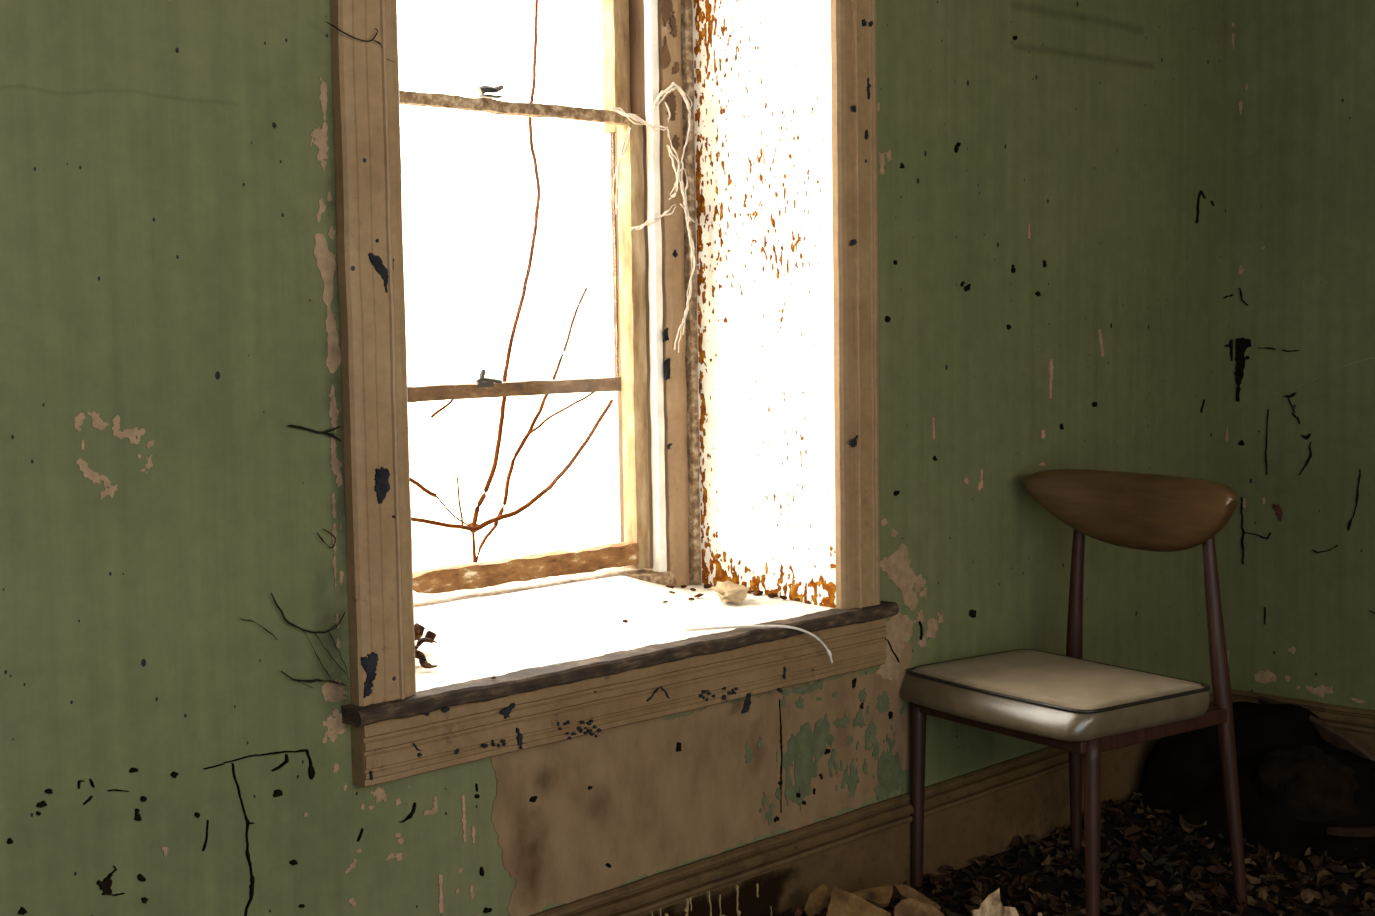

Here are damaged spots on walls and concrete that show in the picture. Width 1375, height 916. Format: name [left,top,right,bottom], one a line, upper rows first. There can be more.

peeling [661,0,836,608]
peeling [74,411,154,499]
flaking render [455,517,944,916]
crack [202,749,315,916]
peeling [344,828,364,874]
peeling [360,770,438,861]